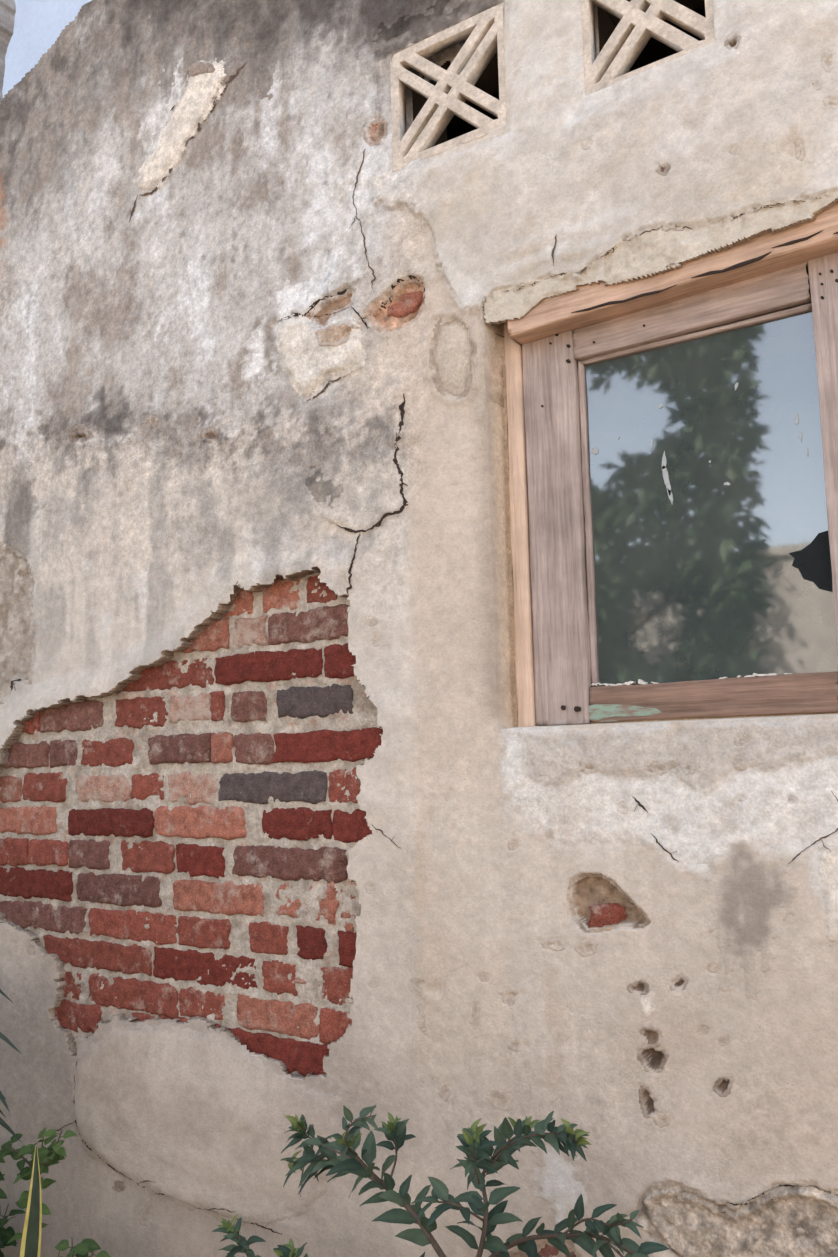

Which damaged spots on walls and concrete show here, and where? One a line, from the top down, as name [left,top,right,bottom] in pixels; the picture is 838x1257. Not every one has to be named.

water stain [78,0,505,338]
crack [277,150,425,329]
water stain [239,279,308,404]
peeling [276,276,425,403]
water stain [71,384,138,534]
water stain [184,383,409,604]
crack [337,393,408,596]
flaking render [0,544,383,1081]
crack [788,792,838,864]
spalling [541,873,651,957]
water stain [695,838,799,1000]
spalling [633,1181,838,1257]